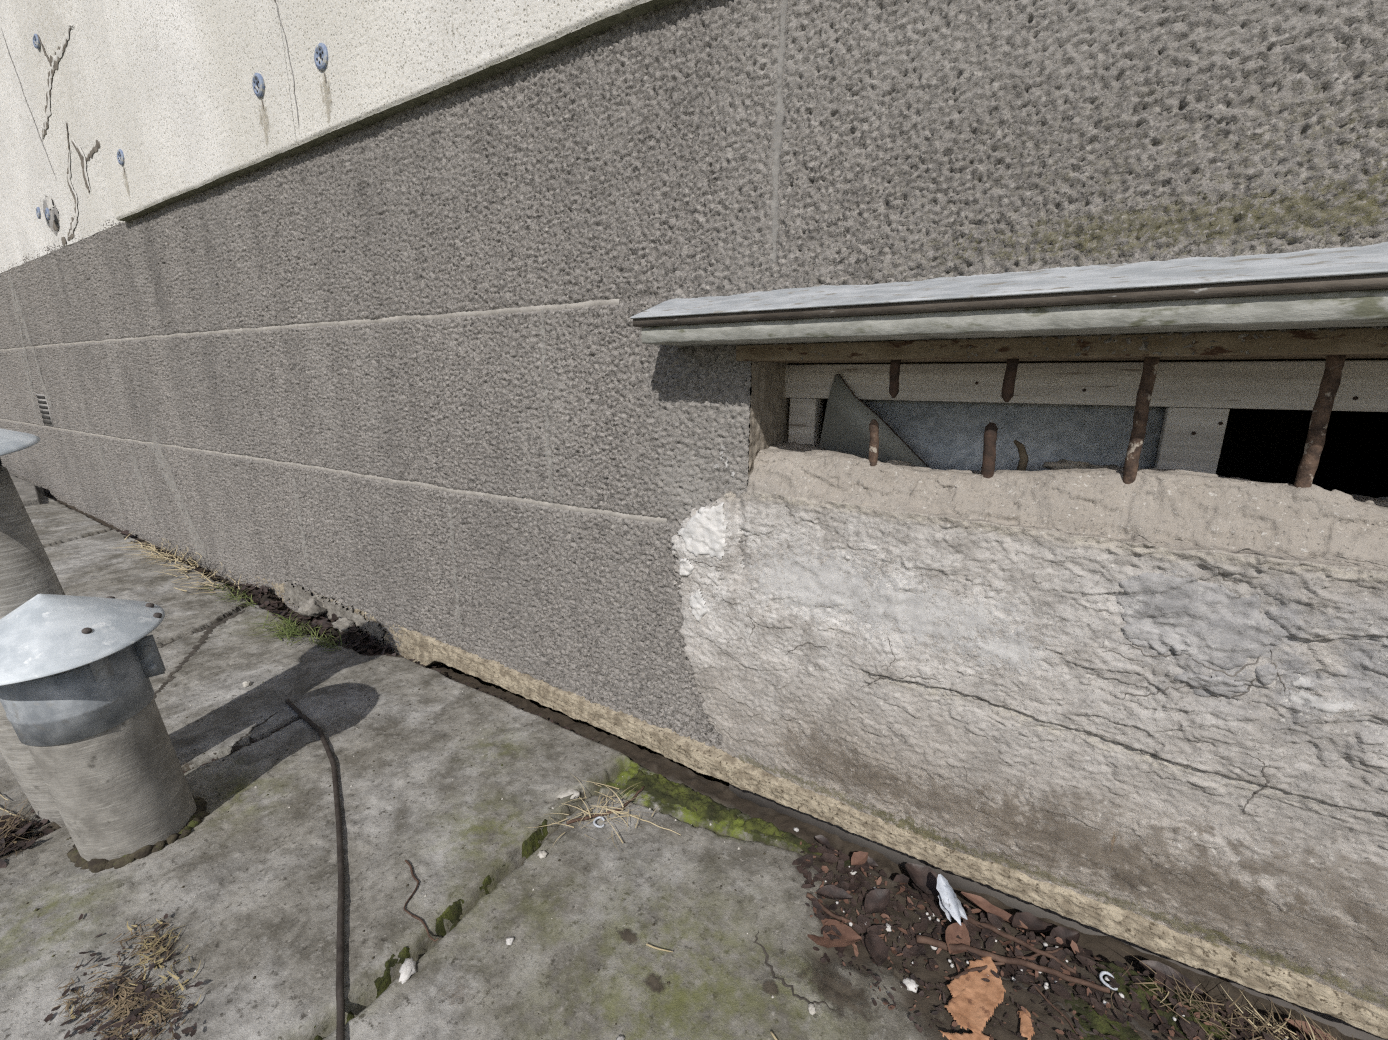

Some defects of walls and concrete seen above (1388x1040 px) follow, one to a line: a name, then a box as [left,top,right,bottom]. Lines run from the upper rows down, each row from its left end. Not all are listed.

crack [274,0,299,127]
crack [1,24,100,246]
crack [1218,548,1287,585]
crack [1102,641,1286,700]
crack [1244,756,1270,814]